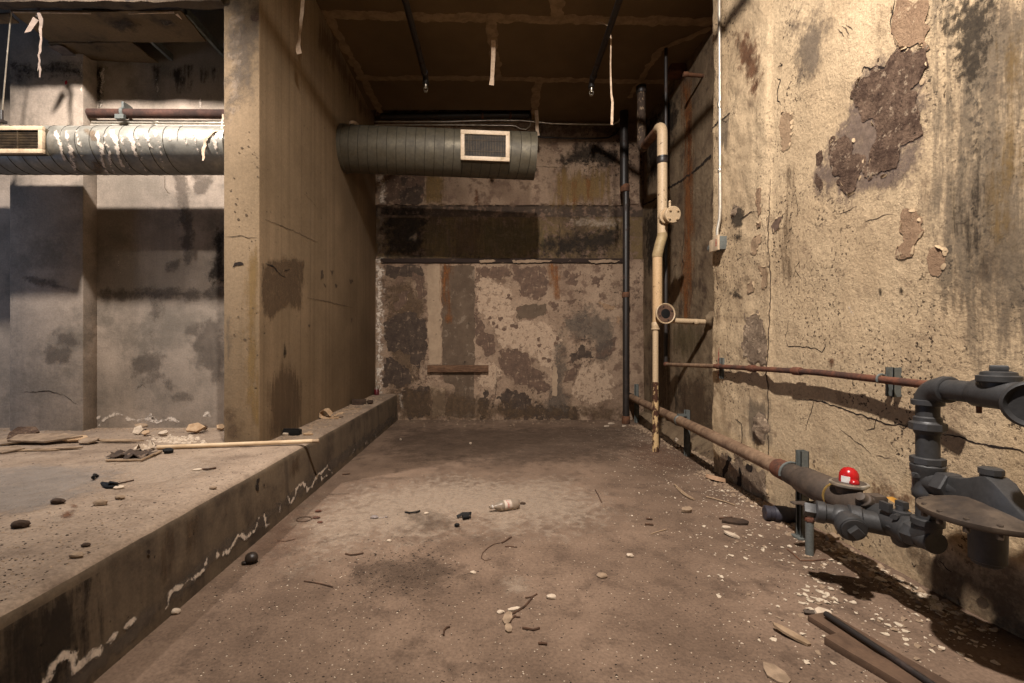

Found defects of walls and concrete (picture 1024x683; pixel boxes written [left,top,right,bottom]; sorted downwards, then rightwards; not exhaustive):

flaking render [814,0,930,197]
peeling [778,111,793,152]
leakage [934,0,1024,336]
rust [680,81,695,319]
peeling [895,208,924,260]
peeling [926,245,948,277]
flaking render [741,310,767,366]
leakage [0,175,621,683]
crack [800,399,908,458]
crack [943,434,1024,453]